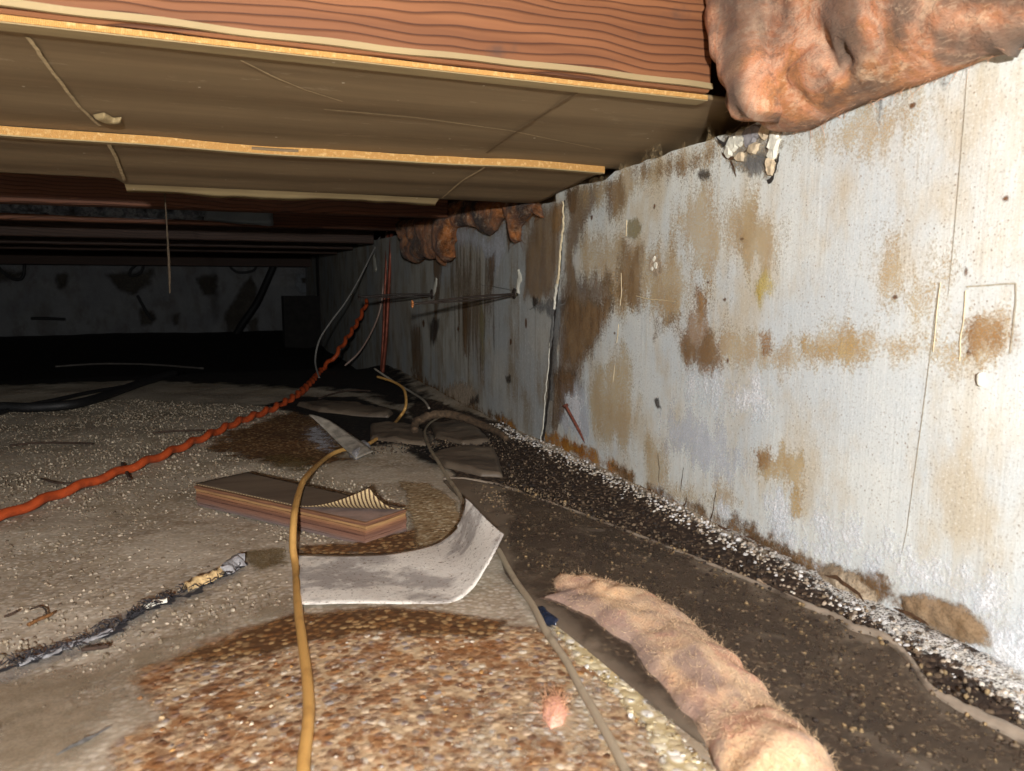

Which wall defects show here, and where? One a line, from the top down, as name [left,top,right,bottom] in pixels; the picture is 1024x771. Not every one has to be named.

spalling [716,124,783,184]
leakage [410,221,510,419]
crack [530,200,566,441]
leakage [516,134,779,449]
leakage [881,232,955,328]
crack [899,70,968,564]
leakage [624,316,1024,711]